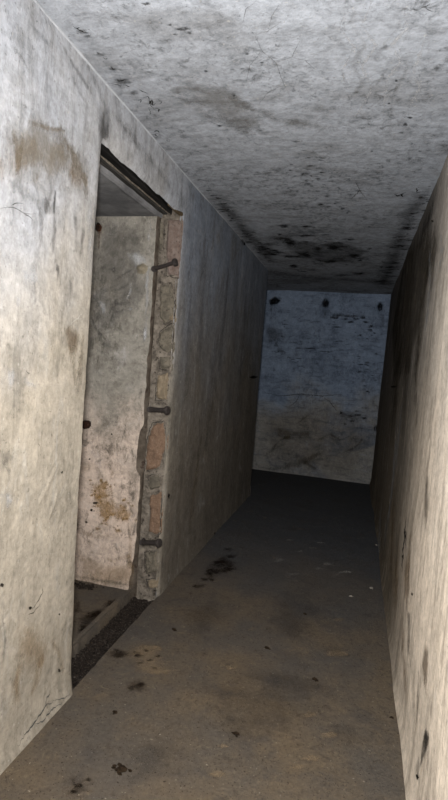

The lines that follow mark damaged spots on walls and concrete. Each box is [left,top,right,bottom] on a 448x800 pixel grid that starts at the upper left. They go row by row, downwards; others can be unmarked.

leakage [16,125,77,174]
crack [19,694,69,746]